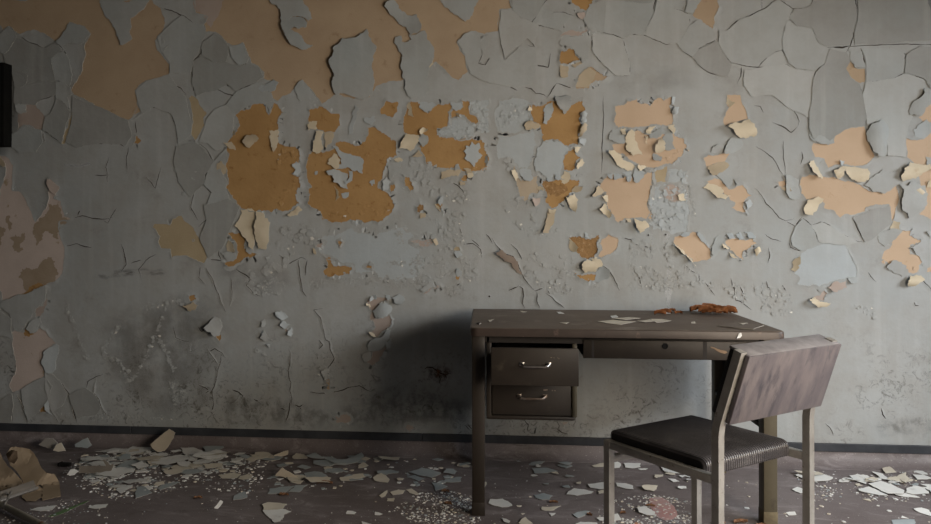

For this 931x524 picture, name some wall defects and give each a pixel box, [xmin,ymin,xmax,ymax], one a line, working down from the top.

crack [468,0,931,175]
crack [0,6,274,313]
peeling [192,0,761,339]
peeling [772,88,931,287]
crack [0,373,109,424]
crack [172,326,258,424]
peeling [260,311,294,348]
crack [279,254,372,422]
crack [458,227,564,308]
crack [684,188,892,310]
peeling [789,242,863,308]
crack [912,275,931,307]